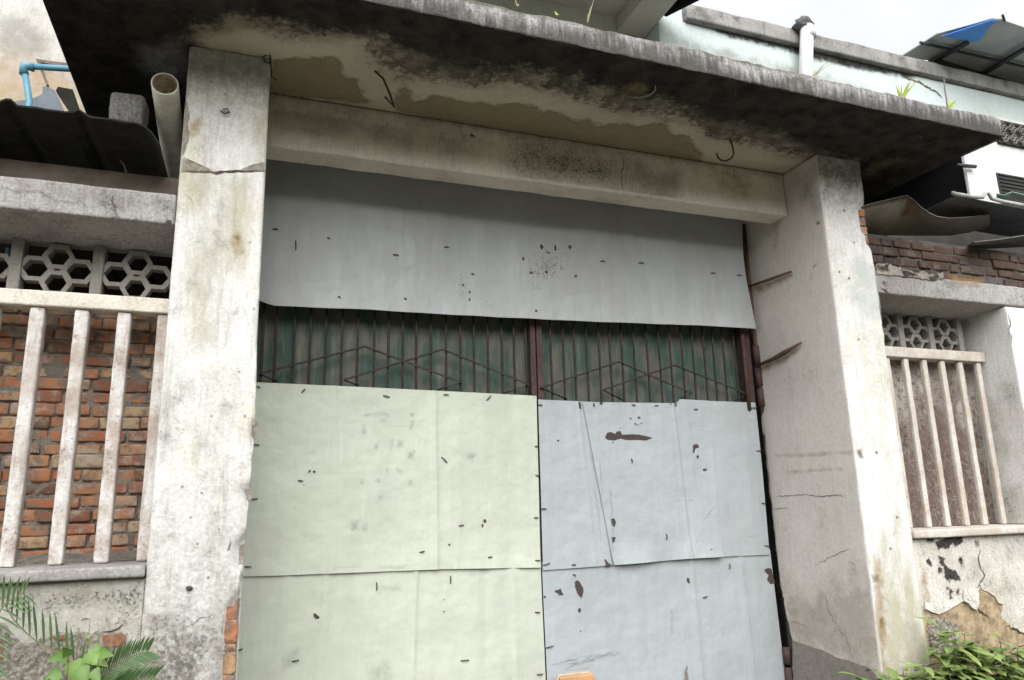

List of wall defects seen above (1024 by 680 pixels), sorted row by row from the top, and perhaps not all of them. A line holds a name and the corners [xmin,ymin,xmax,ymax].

leakage [0,0,1003,203]
crack [184,157,266,205]
rust [749,271,792,287]
spalling [876,263,944,280]
rust [754,342,802,367]
crack [977,550,1024,634]
peeling [922,583,1024,675]